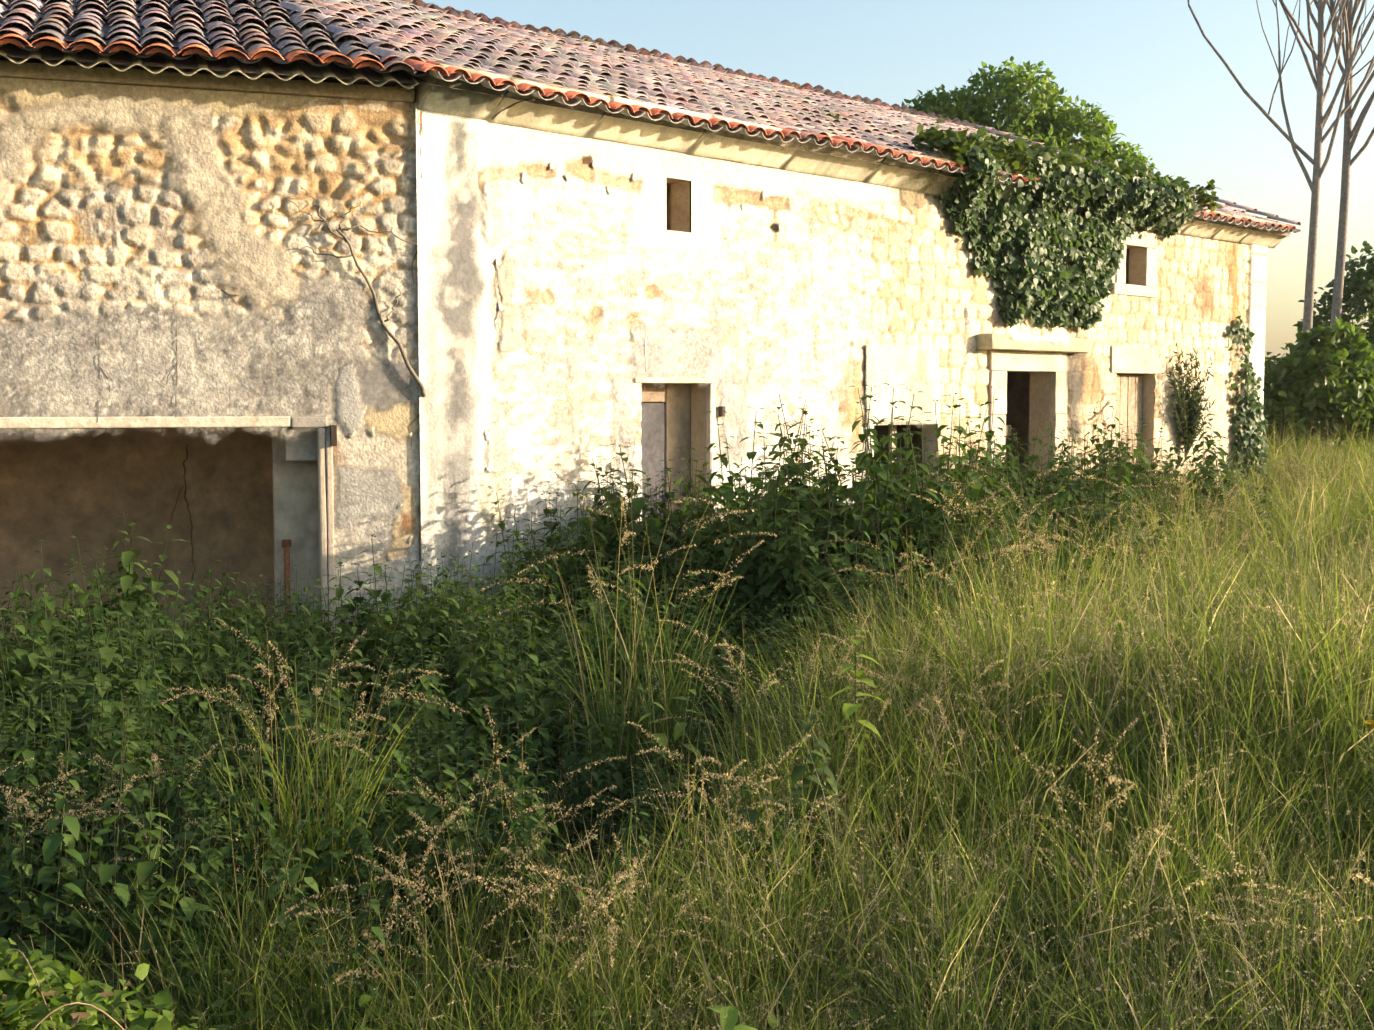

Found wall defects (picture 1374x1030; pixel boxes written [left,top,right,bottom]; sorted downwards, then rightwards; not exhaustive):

spalling [24,125,176,185]
spalling [218,83,422,199]
spalling [810,189,927,250]
damp [362,124,485,563]